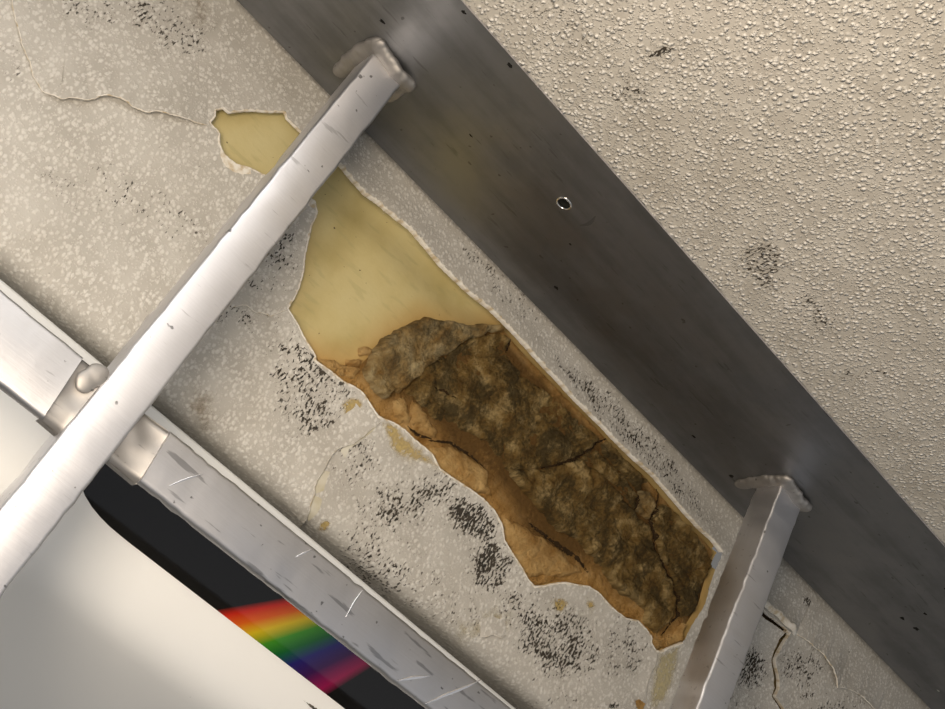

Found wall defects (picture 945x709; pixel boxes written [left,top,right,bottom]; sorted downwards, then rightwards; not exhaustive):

damp [267,315,361,435]
damp [387,425,427,461]
peeling [316,317,713,650]
damp [555,355,708,520]
damp [338,473,648,678]
damp [740,647,768,689]
crack [762,586,804,709]
damp [781,646,856,709]